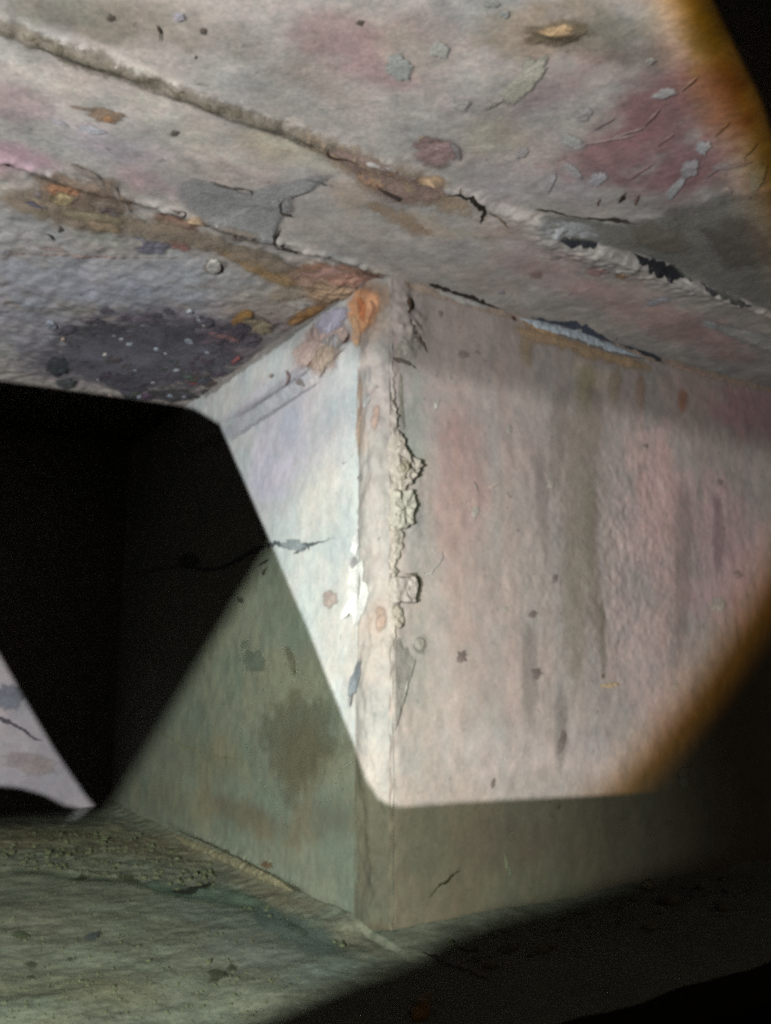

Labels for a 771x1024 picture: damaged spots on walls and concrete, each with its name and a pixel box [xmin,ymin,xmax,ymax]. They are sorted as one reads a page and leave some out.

corrosion [525,20,586,46]
corrosion [70,106,124,124]
peeling [178,177,325,254]
crack [444,188,507,227]
crack [536,191,753,307]
corrosion [0,163,382,397]
crack [124,539,328,577]
peeling [341,529,369,626]
crack [429,871,459,898]